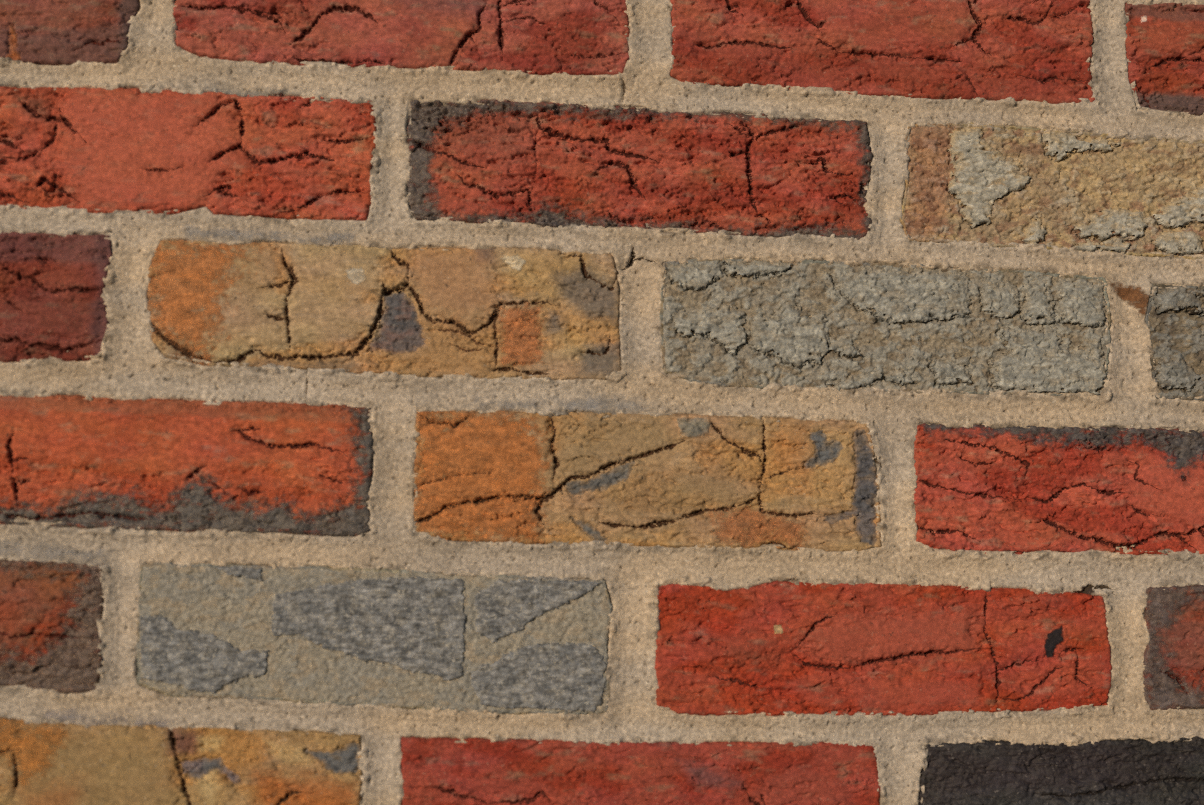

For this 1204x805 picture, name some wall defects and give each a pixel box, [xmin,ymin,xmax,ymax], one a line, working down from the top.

crack [181,0,385,65]
crack [695,0,1087,96]
crack [144,100,363,213]
crack [413,114,663,207]
spalling [901,125,1204,257]
crack [155,247,560,401]
spalling [662,260,1109,395]
spalling [1149,286,1204,399]
crack [416,418,685,525]
crack [599,420,818,549]
crack [917,439,1204,553]
crack [792,597,1092,708]